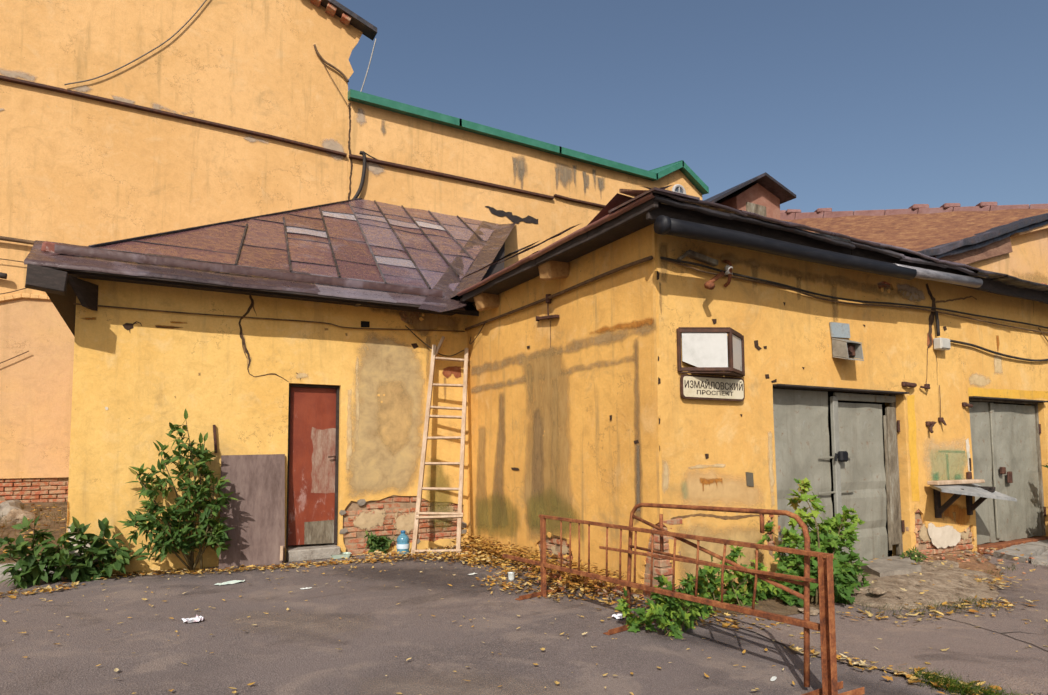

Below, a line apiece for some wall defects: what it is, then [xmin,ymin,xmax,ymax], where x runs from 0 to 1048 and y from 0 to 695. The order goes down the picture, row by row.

damp [513,158,525,187]
damp [555,164,604,190]
flaking render [339,335,467,555]
damp [471,318,654,536]
flaking render [0,472,99,562]
flaking render [905,509,976,557]